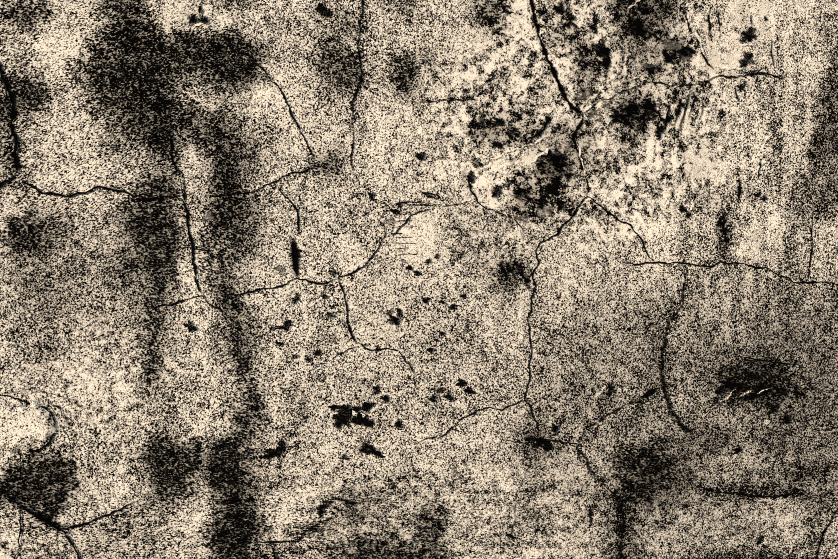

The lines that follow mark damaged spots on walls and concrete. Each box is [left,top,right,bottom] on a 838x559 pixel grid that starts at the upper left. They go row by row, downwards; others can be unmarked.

crack [350,0,364,173]
peeling [542,0,720,81]
peeling [575,86,703,140]
peeling [722,13,757,100]
peeling [464,94,597,238]
crack [0,62,523,375]
damp [0,0,273,559]
crack [415,0,838,559]
crack [0,388,89,481]
crack [13,502,134,559]
crack [255,516,337,559]
damp [290,499,460,559]